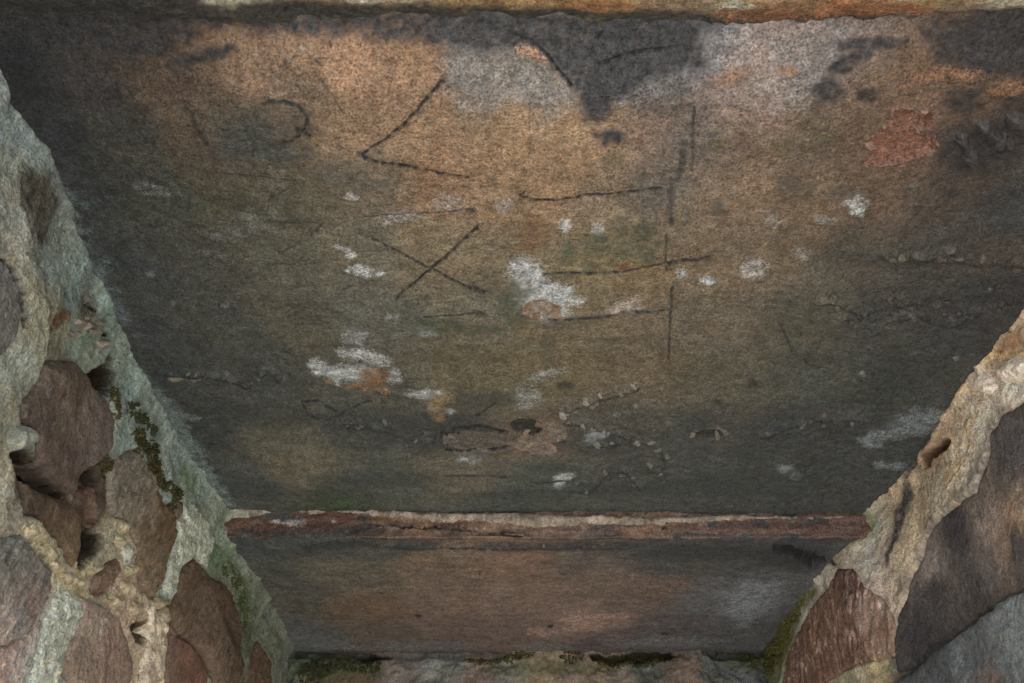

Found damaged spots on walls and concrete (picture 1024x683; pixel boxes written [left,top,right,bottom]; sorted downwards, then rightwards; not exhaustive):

leakage [0,0,1024,150]
leakage [331,242,388,280]
leakage [130,248,847,654]
spalling [442,383,670,476]